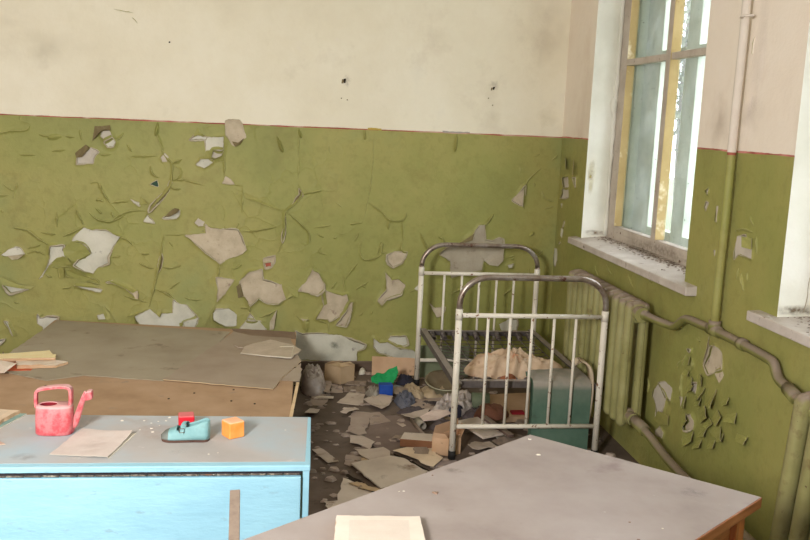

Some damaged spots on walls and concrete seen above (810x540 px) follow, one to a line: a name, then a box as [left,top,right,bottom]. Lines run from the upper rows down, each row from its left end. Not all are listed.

crack [0,125,82,157]
peeling [74,125,120,168]
peeling [185,118,247,171]
crack [0,132,216,326]
spalling [128,178,183,225]
peeling [0,216,415,362]
crack [216,152,444,293]
peeling [374,248,424,308]
peeling [436,222,516,281]
peeling [733,232,755,263]
peeling [495,318,521,331]
peeling [652,338,736,449]